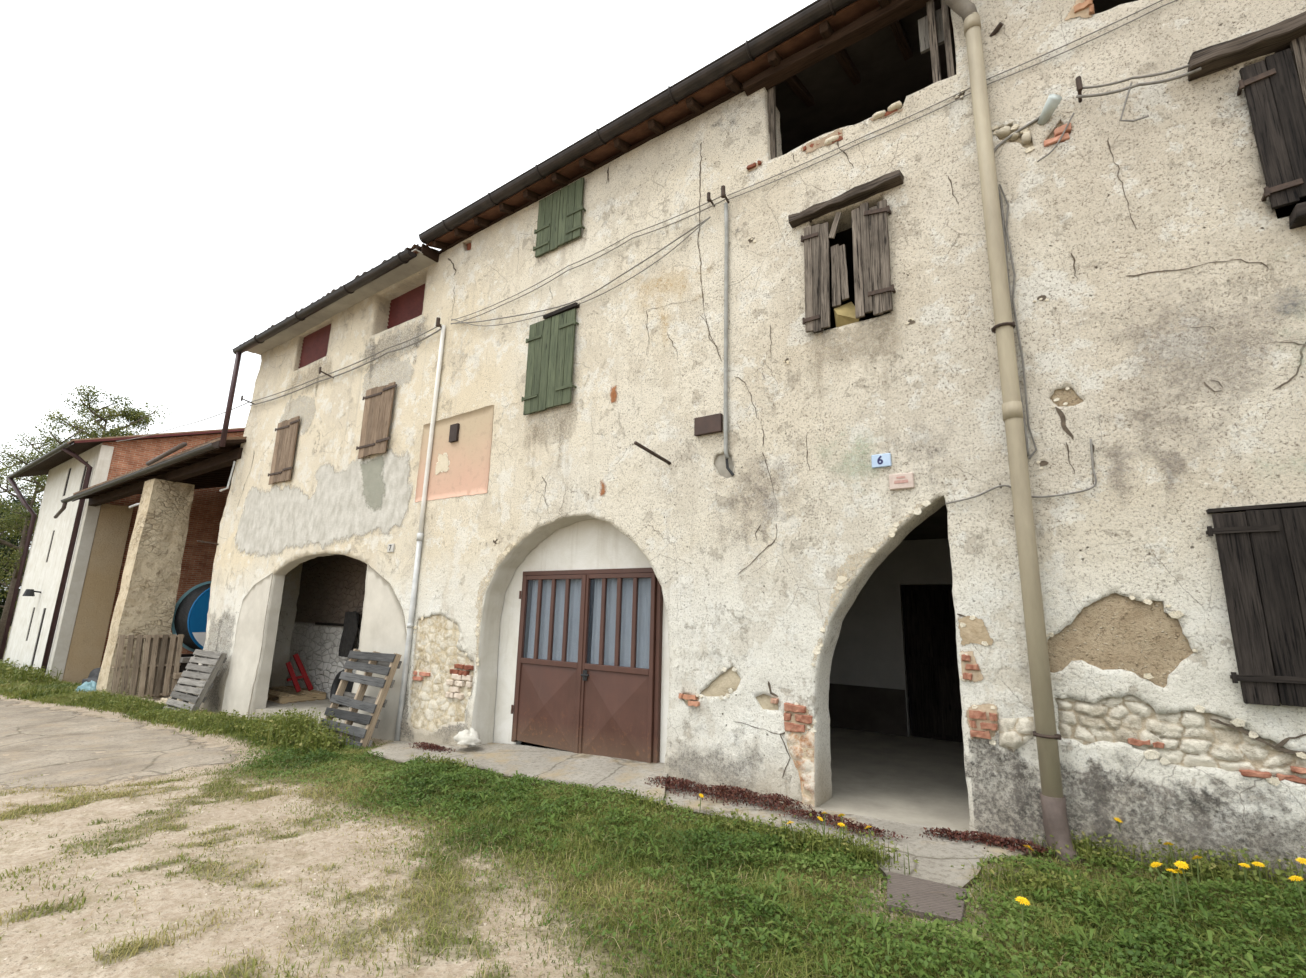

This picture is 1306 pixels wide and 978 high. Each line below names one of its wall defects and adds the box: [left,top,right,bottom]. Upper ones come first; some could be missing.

crack [1127,259,1269,277]
crack [646,142,777,575]
flaking render [1050,387,1083,408]
crack [1274,342,1306,390]
flaking render [410,537,519,732]
flaking render [958,615,993,682]
flaking render [1046,593,1198,688]
peeling [678,667,741,707]
flaking render [756,694,817,807]
flaking render [966,704,1035,752]
flaking render [1055,695,1306,786]